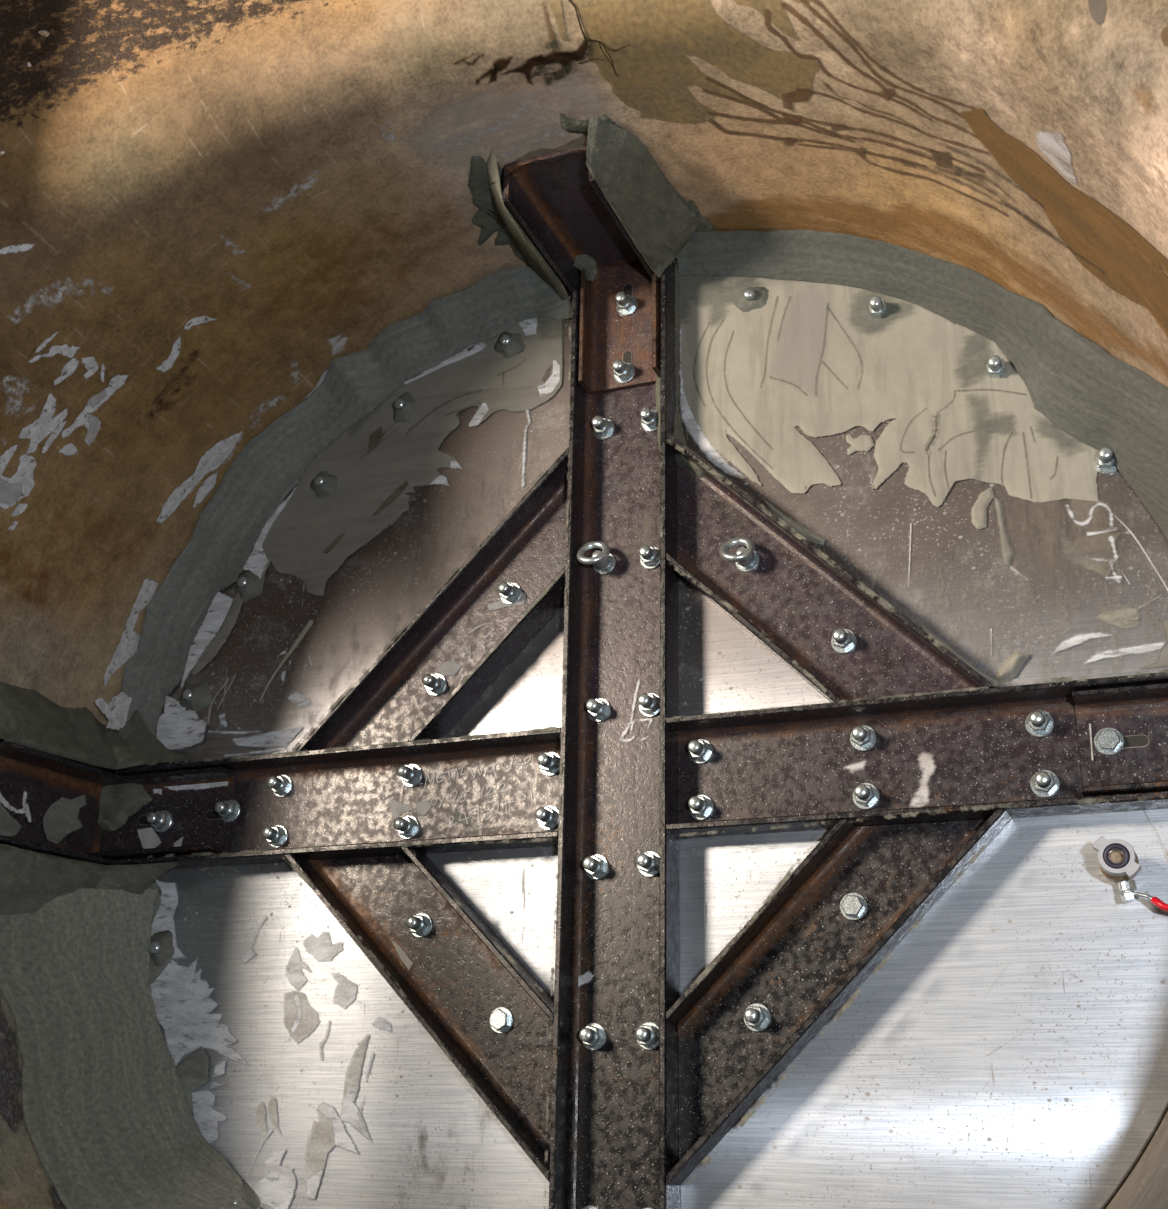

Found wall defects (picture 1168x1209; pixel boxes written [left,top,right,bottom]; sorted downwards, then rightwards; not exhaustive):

crack [569,0,630,77]
corrosion [710,200,1168,373]
peeling [54,357,105,385]
peeling [0,421,78,530]
peeling [193,471,218,508]